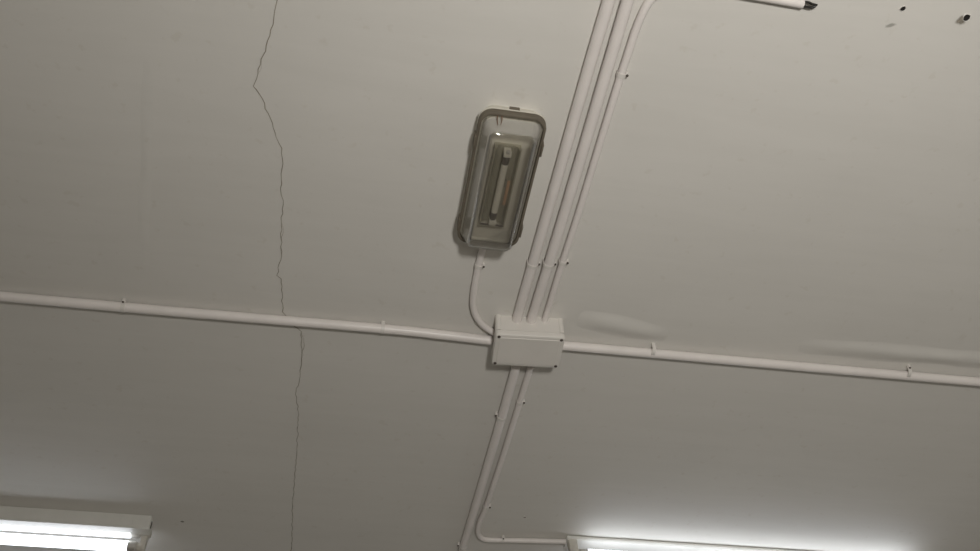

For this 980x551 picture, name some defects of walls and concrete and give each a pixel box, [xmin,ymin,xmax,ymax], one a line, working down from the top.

crack [253,0,305,549]